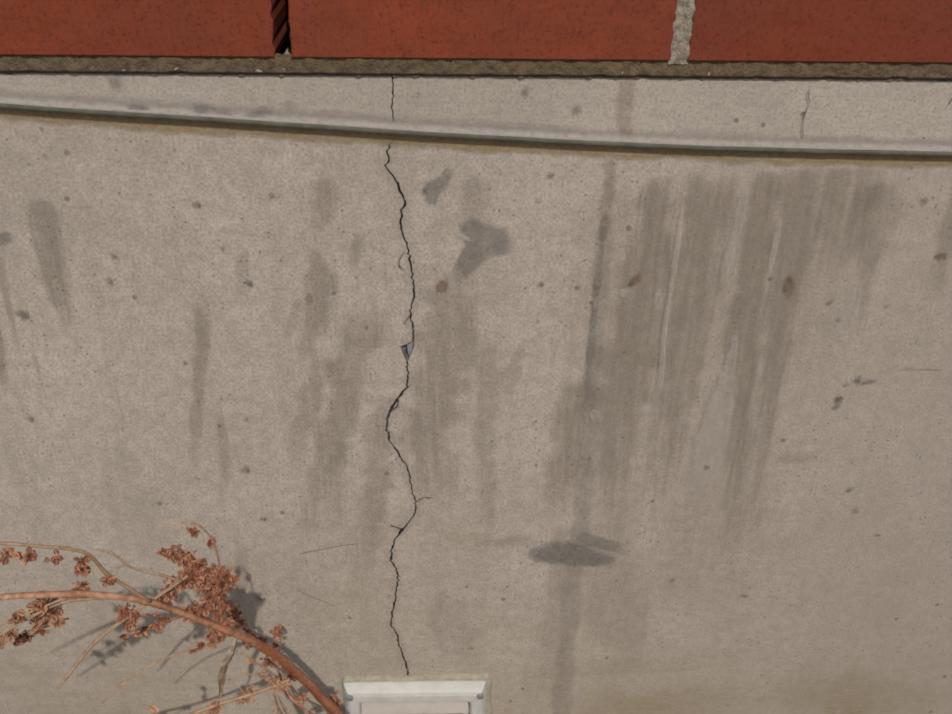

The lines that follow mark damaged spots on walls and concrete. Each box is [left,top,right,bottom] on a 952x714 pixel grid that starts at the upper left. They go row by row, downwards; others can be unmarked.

crack [384,76,433,676]